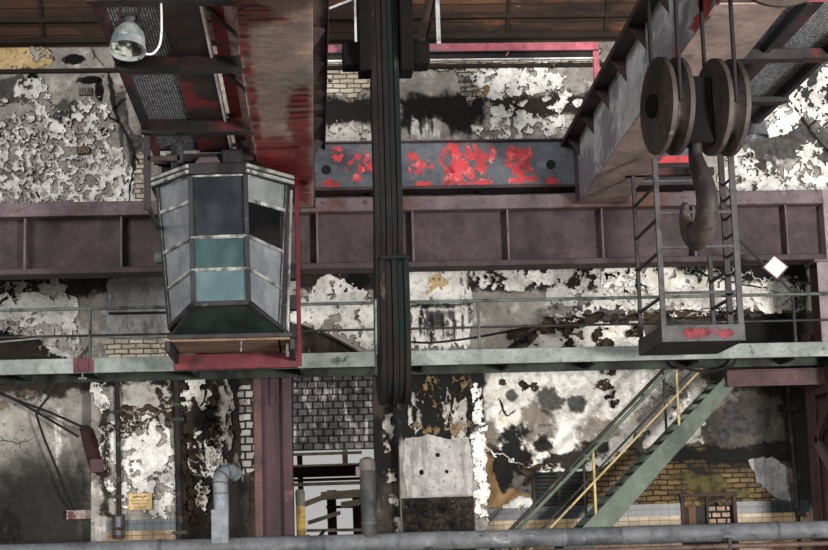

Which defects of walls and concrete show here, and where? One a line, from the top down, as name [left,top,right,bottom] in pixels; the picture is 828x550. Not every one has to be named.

peeling [0,46,144,203]
leakage [326,93,371,127]
leakage [400,86,588,140]
peeling [430,46,602,139]
peeling [716,62,828,191]
peeling [0,279,86,358]
peeling [290,273,374,350]
peeling [409,266,804,351]
peeling [90,379,254,525]
leakage [392,370,643,494]
spalling [383,368,707,533]
flaking render [632,422,791,507]